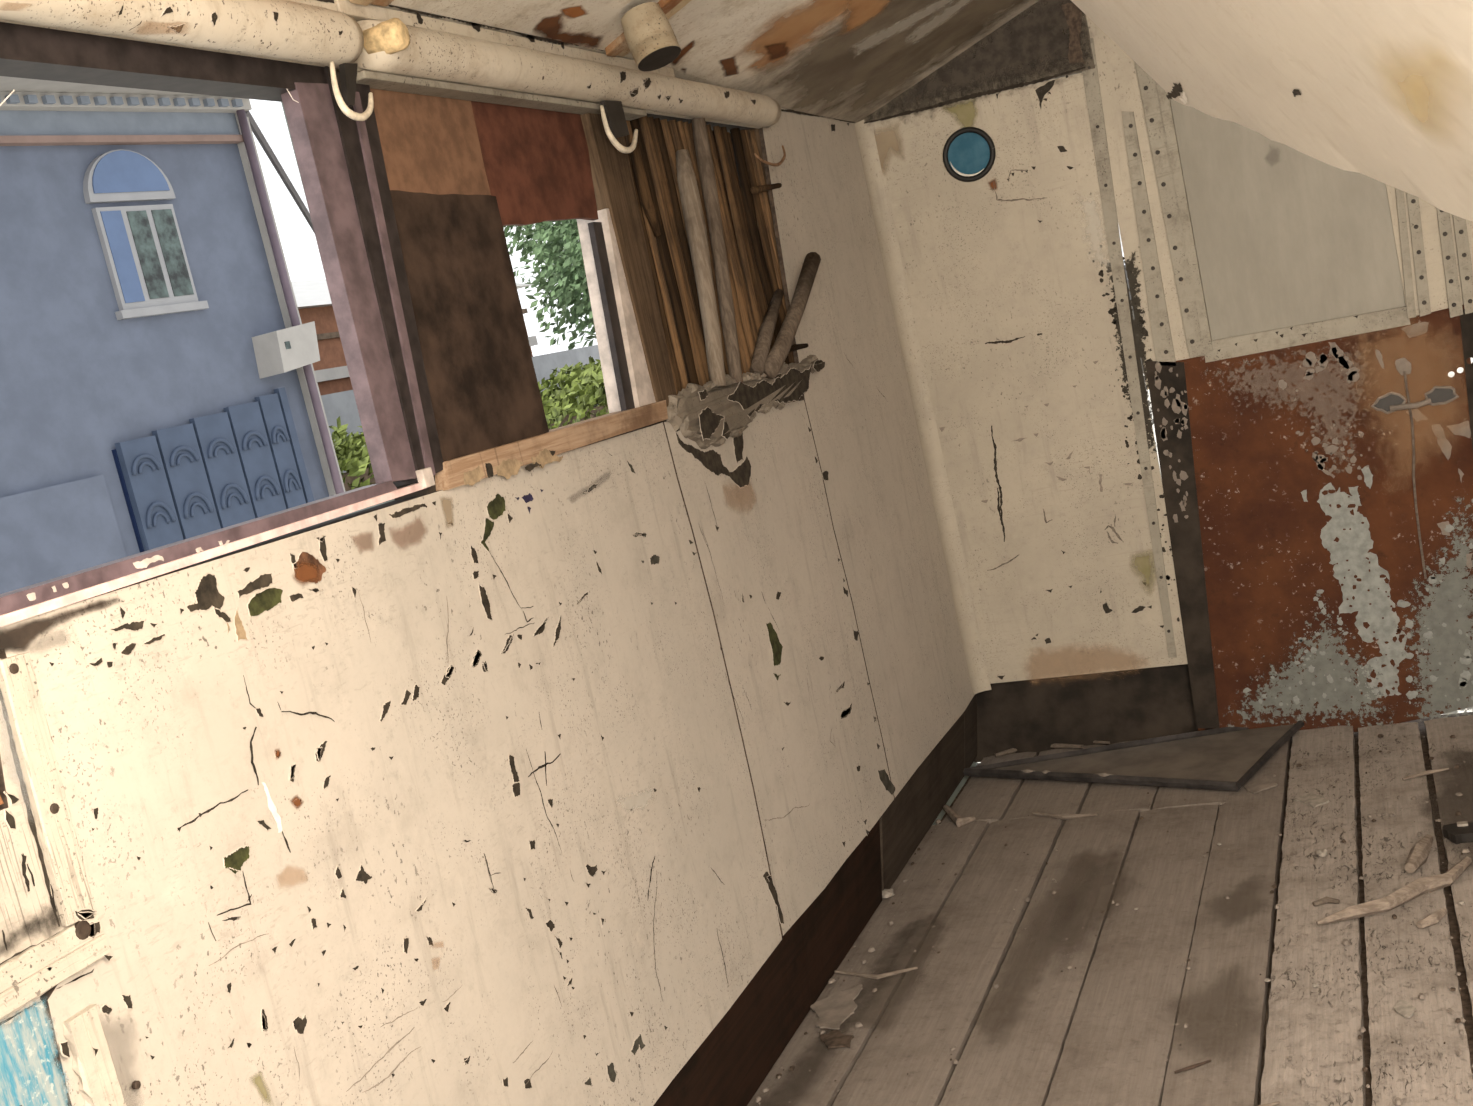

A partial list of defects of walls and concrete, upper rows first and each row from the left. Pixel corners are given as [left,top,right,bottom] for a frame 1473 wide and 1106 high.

peeling [675,359,825,488]
peeling [374,501,436,546]
peeling [464,449,564,621]
peeling [180,535,340,642]
peeling [440,592,588,686]
peeling [766,622,783,681]
peeling [379,684,420,723]
peeling [314,740,339,802]
peeling [508,754,520,798]
peeling [210,845,250,874]
peeling [334,864,373,900]
peeling [291,1014,307,1035]